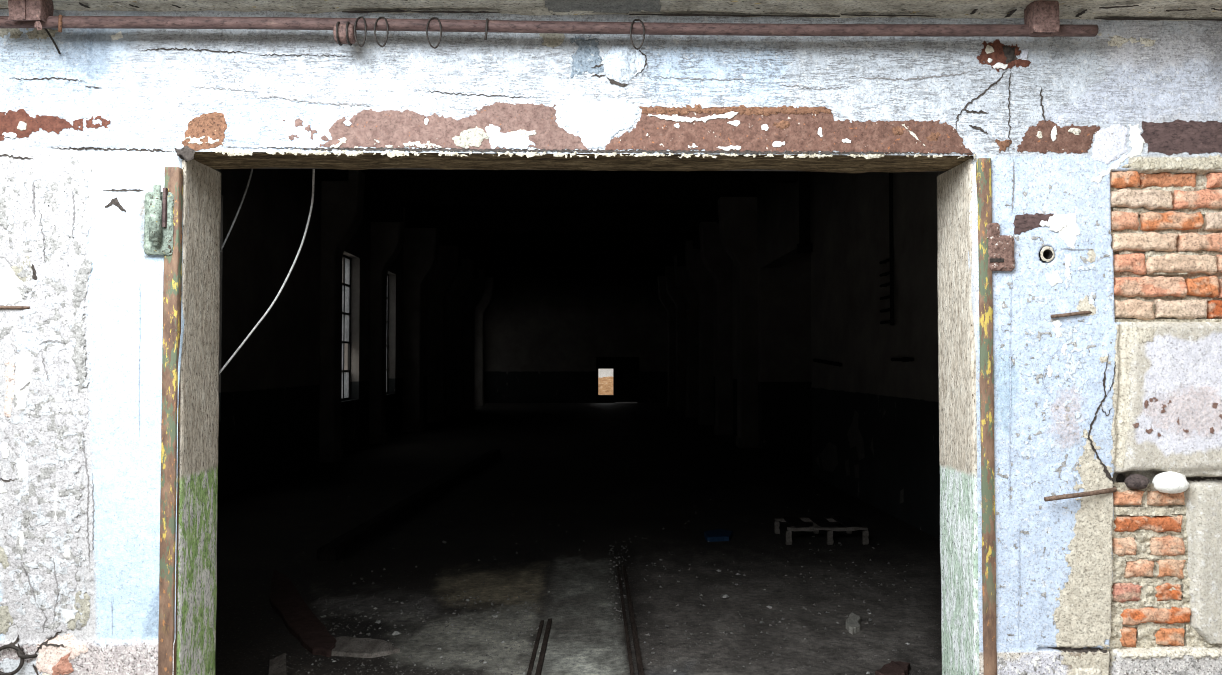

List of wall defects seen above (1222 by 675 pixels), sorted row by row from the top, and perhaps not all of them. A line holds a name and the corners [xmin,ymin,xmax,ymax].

crack [342,7,500,15]
crack [629,11,936,19]
peeling [175,99,977,162]
crack [227,50,1015,209]
crack [1039,87,1047,122]
spalling [105,197,126,212]
flaking render [0,109,110,675]
crack [1087,354,1116,484]
flaking render [995,119,1222,675]